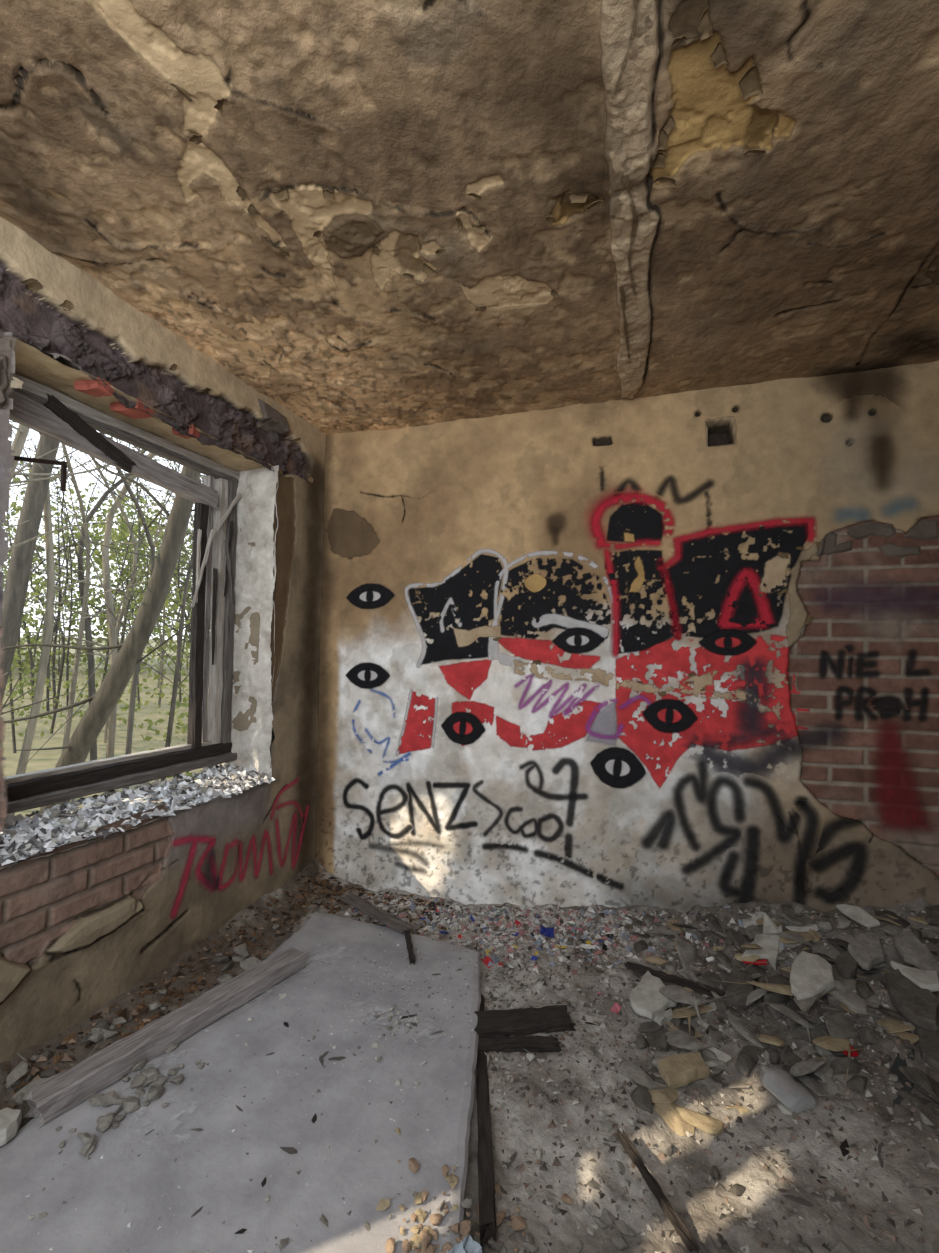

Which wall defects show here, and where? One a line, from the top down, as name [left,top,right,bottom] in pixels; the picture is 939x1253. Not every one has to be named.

crack [0,59,106,112]
peeling [651,0,796,187]
peeling [85,0,373,287]
peeling [465,175,504,200]
crack [644,0,664,381]
peeling [371,231,446,290]
peeling [456,211,493,253]
crack [715,193,885,251]
peeling [460,275,559,311]
peeling [325,508,380,559]
flaking render [758,515,939,878]
flaking render [0,803,174,1005]